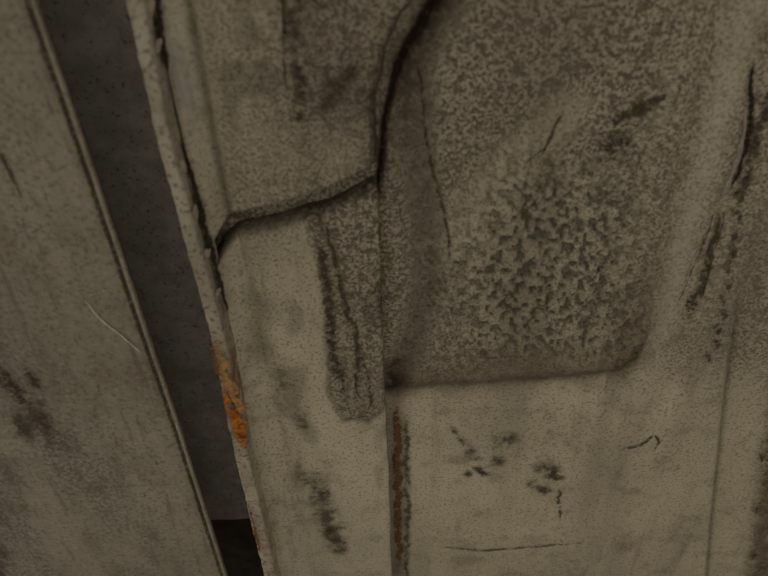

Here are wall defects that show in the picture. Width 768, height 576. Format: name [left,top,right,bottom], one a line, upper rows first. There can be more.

crack [677,62,768,362]
rust [210,343,248,448]
leakage [452,430,488,477]
leakage [528,465,564,519]